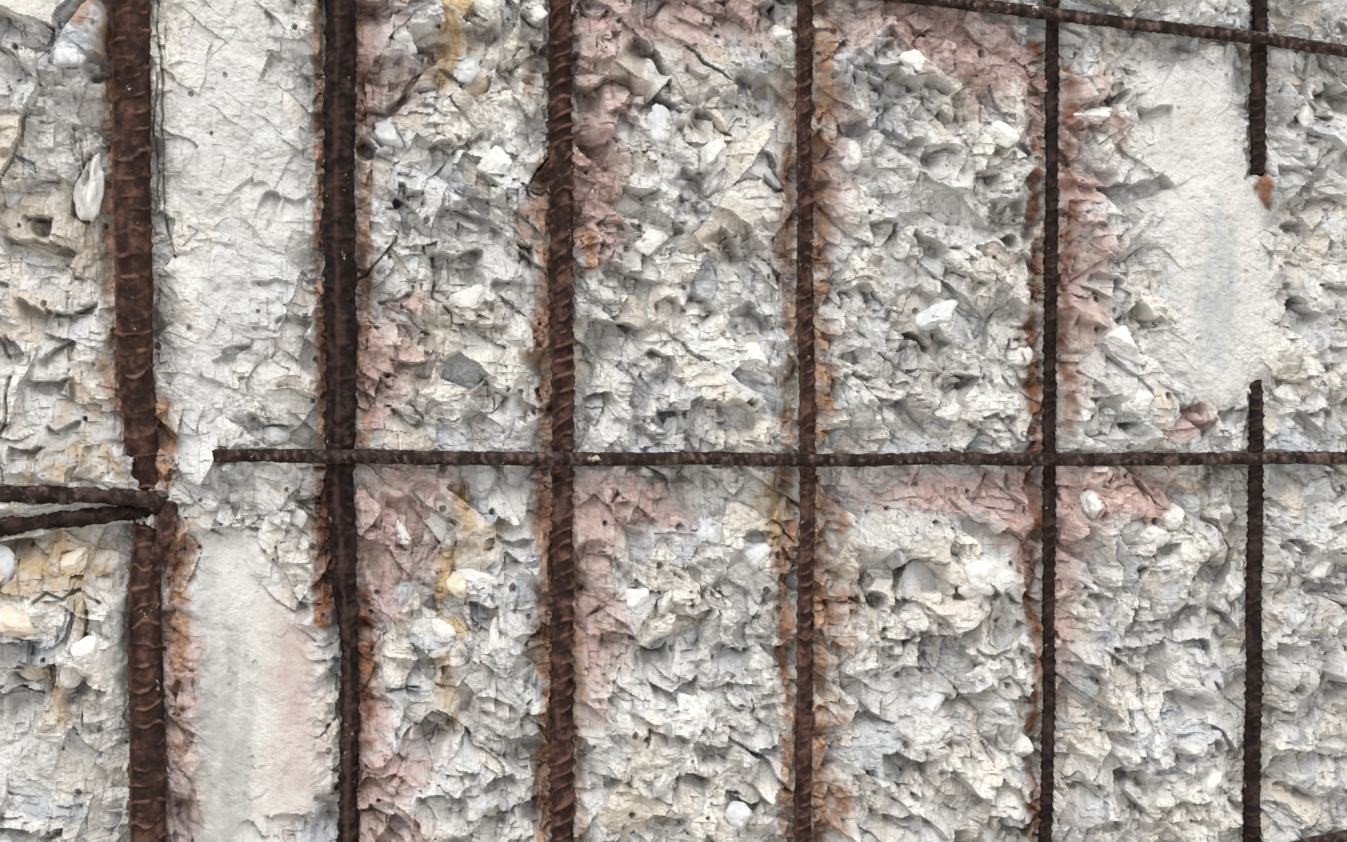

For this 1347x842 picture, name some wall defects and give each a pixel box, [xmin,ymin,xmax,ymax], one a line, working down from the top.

spalling [0,25,43,89]
spalling [109,0,160,494]
spalling [249,414,295,446]
corrosion [518,158,552,452]
spalling [321,0,1347,842]
corrosion [811,0,1045,453]
corrosion [1056,66,1128,351]
spalling [0,518,169,842]
corrosion [161,528,198,813]
corrosion [530,468,553,842]
corrosion [752,466,860,842]
corrosion [880,466,1170,741]